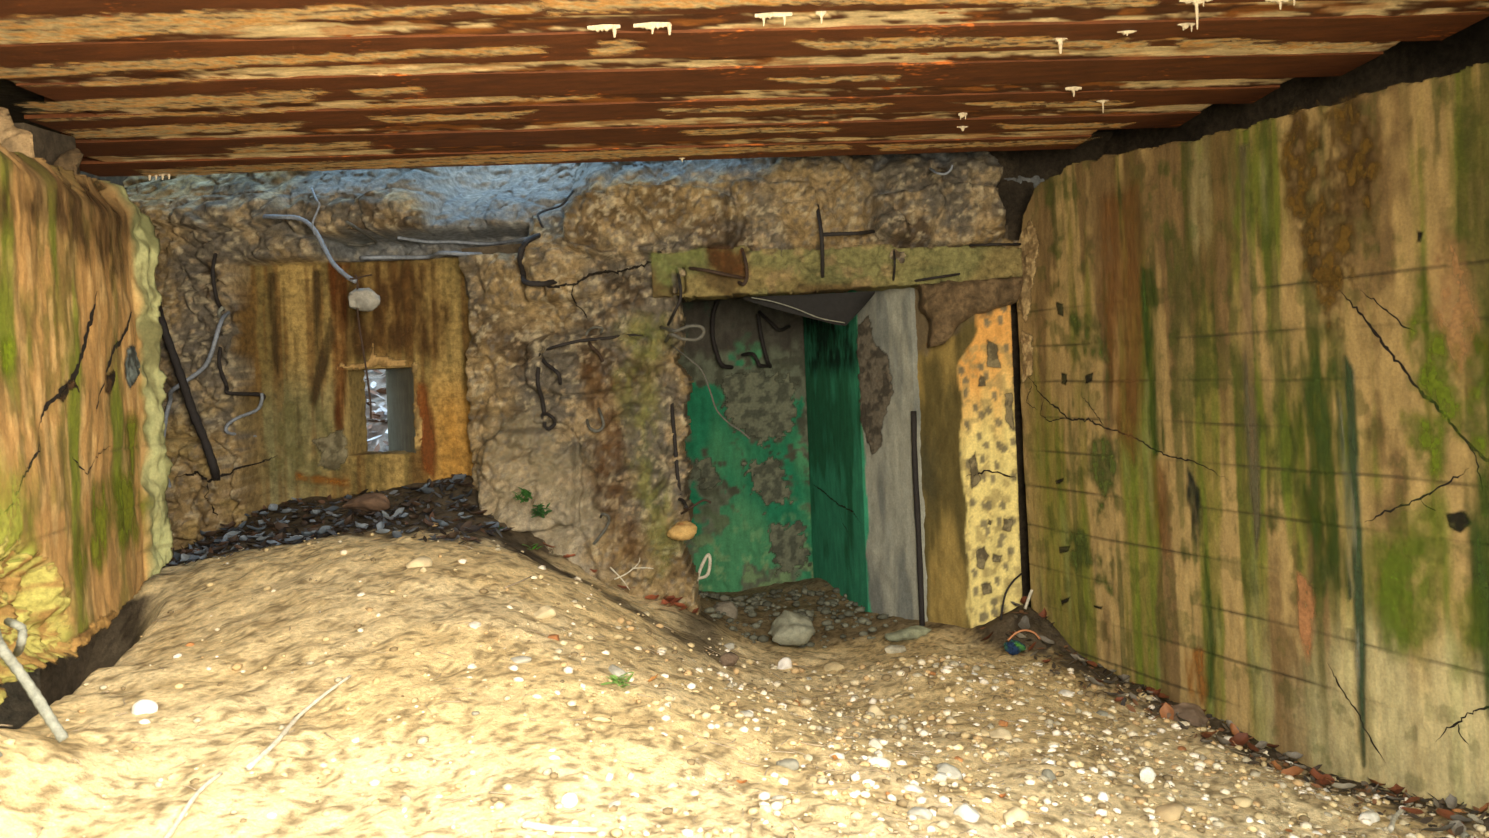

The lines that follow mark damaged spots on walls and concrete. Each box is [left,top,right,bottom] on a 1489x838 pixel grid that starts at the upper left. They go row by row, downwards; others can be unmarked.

damp [56,189,123,282]
damp [1281,102,1381,327]
peeling [1435,242,1479,371]
crack [5,292,132,512]
damp [125,418,137,485]
peeling [536,248,812,576]
flaking render [856,315,894,454]
damp [1187,472,1200,529]
damp [1341,358,1366,766]
crack [1342,292,1489,522]
spalling [1446,511,1471,532]
crack [1436,706,1488,744]